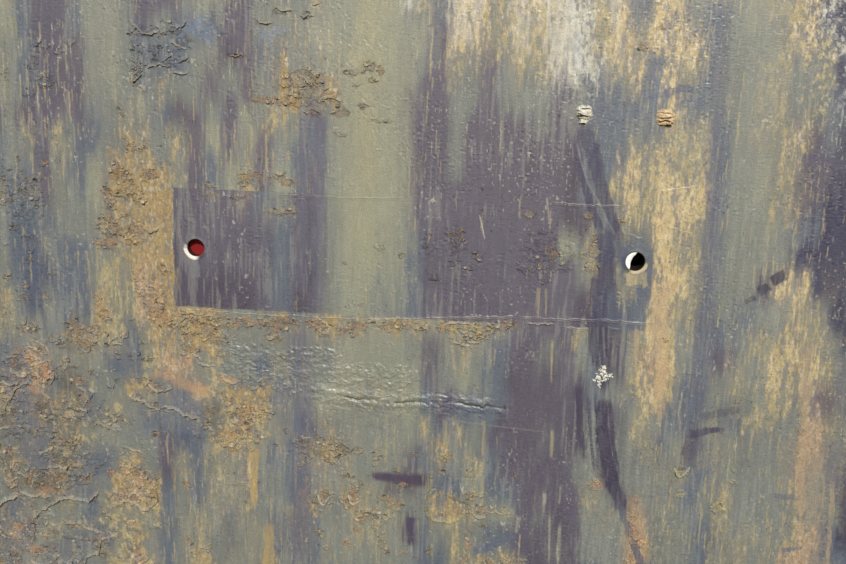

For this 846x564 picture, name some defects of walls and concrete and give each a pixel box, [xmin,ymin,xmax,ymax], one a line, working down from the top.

peeling [126,17,195,95]
peeling [247,57,393,124]
peeling [0,155,51,262]
peeling [92,160,159,254]
peeling [577,231,603,276]
peeling [0,260,554,564]